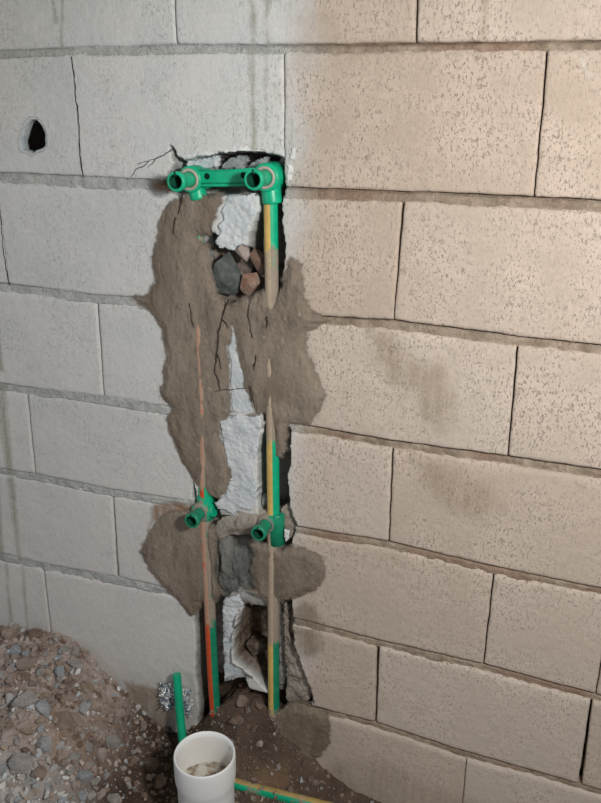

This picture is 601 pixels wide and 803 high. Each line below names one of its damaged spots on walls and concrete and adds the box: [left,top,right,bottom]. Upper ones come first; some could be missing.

crack [71,57,84,177]
crack [128,149,173,179]
crack [0,216,10,284]
crack [214,299,255,408]
crack [247,294,268,367]